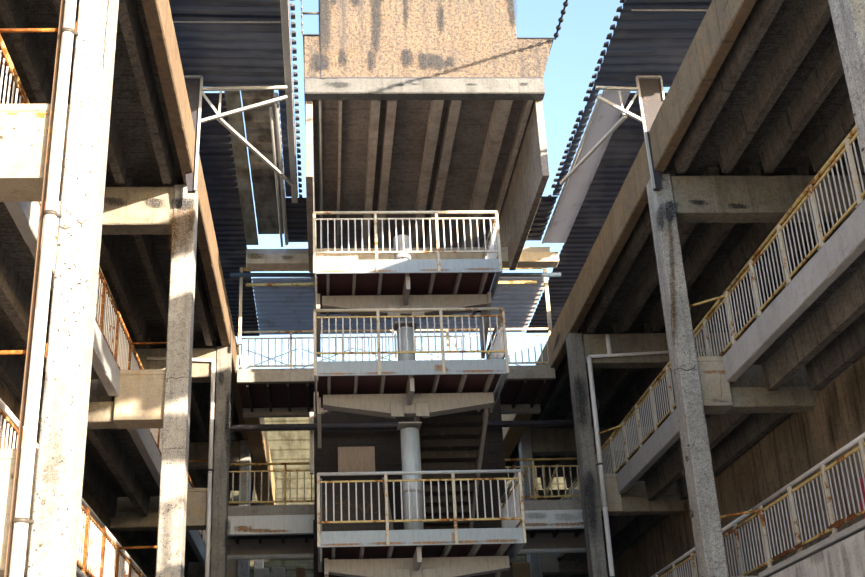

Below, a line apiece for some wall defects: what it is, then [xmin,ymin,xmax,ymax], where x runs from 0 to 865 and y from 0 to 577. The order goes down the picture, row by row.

damp [313,0,347,70]
damp [368,0,382,70]
damp [402,49,454,69]